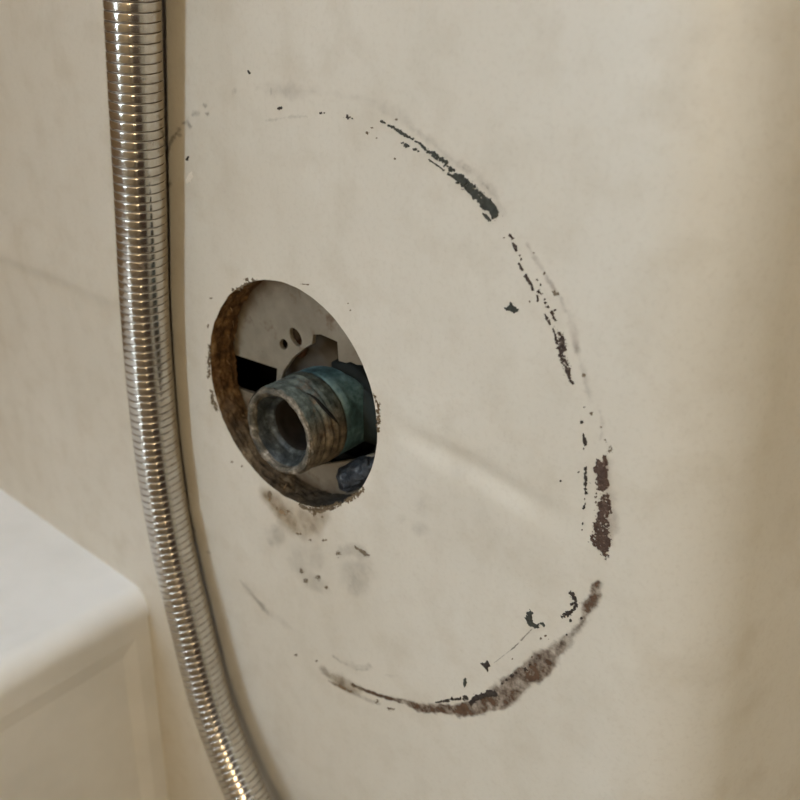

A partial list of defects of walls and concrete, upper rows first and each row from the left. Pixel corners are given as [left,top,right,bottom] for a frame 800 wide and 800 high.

peeling [380,120,499,222]
peeling [508,234,574,385]
peeling [524,609,545,629]
peeling [561,590,580,622]
rust [577,581,600,629]
rust [333,640,566,717]